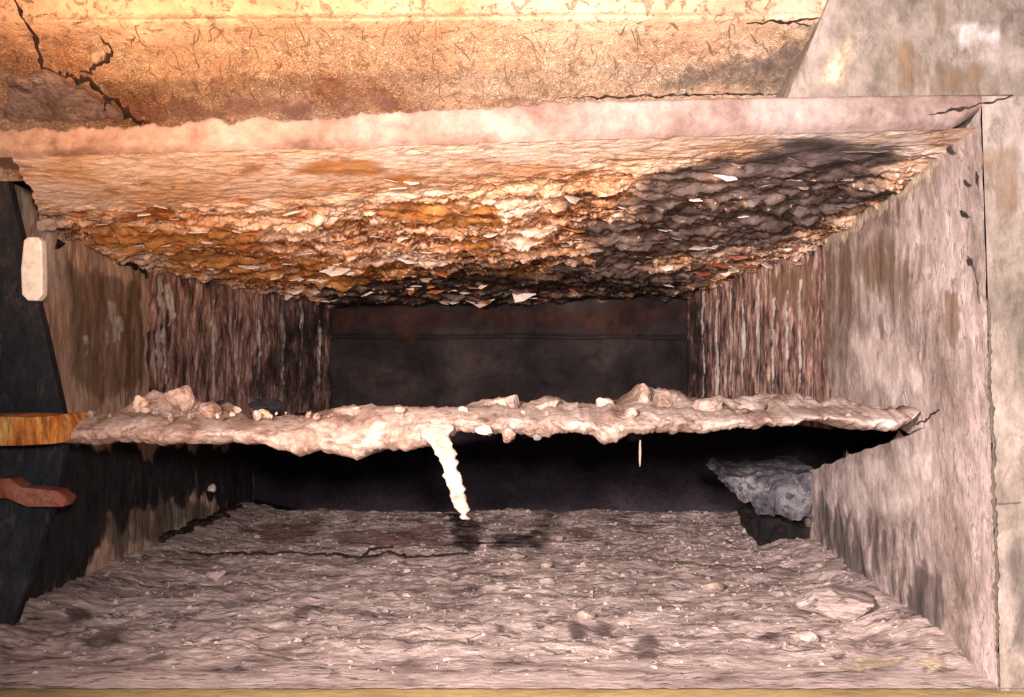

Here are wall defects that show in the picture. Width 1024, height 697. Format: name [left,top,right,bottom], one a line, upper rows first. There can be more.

crack [14,0,819,125]
crack [929,95,1013,115]
damp [70,264,176,399]
peeling [225,212,495,308]
peeling [512,291,547,305]
peeling [537,215,813,299]
damp [824,231,923,407]
hole [963,153,989,347]
crack [158,504,469,559]
spalling [253,425,910,513]
damp [818,437,933,578]
damp [891,562,943,628]